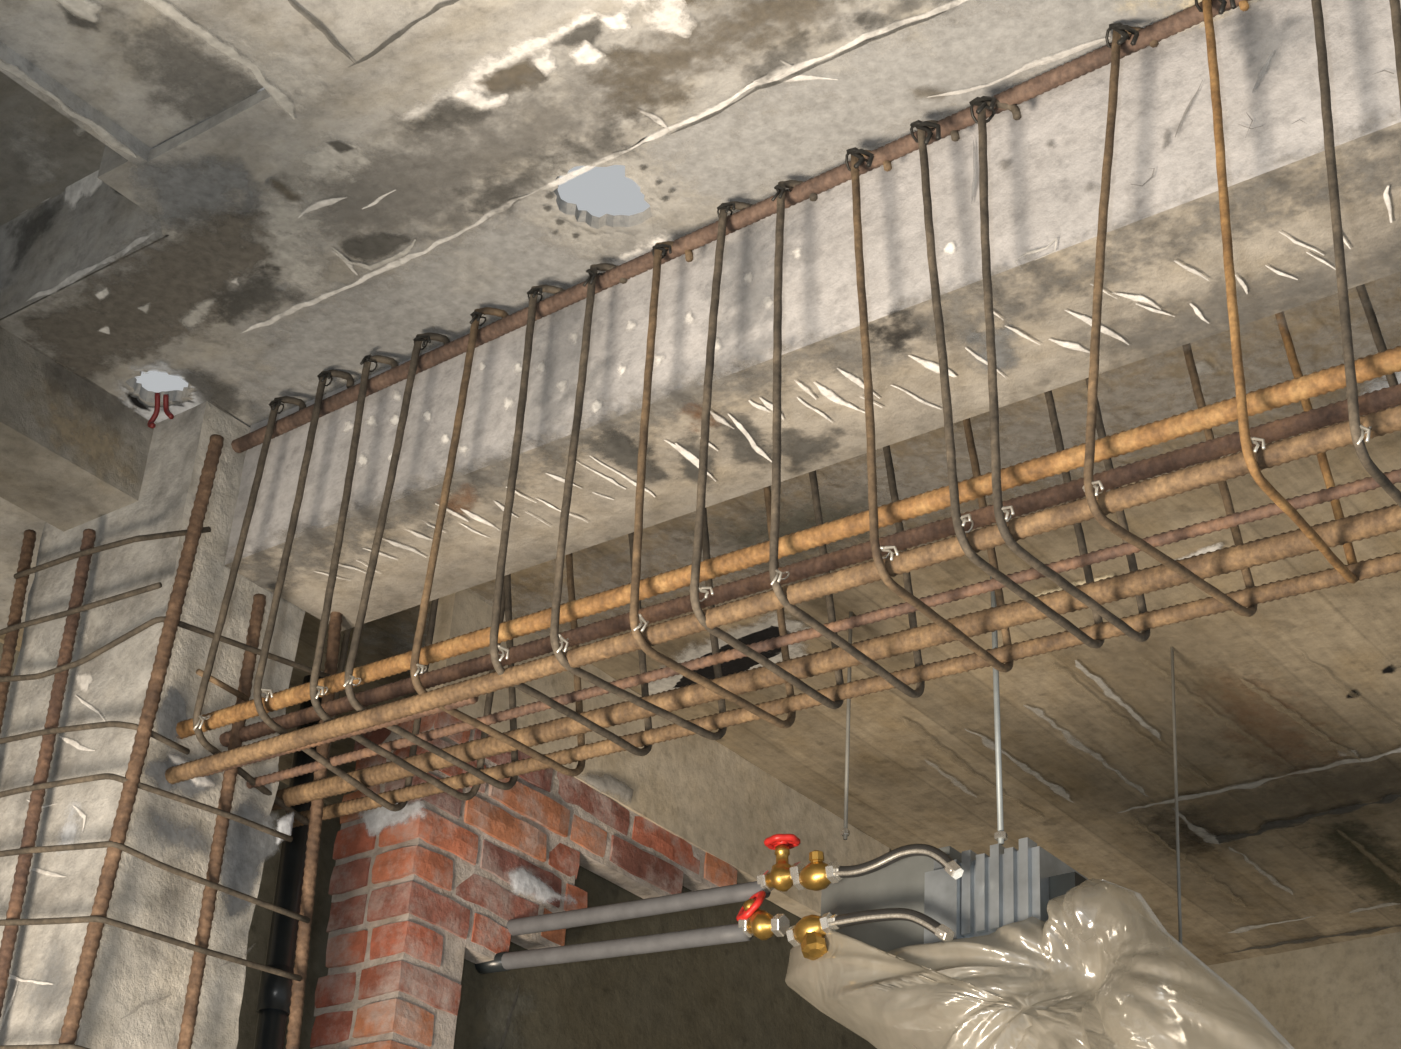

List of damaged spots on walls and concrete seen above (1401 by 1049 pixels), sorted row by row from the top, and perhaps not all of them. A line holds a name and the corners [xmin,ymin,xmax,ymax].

water stain [122,26,265,121]
water stain [298,0,824,243]
crack [242,0,967,333]
water stain [15,157,303,476]
peeling [344,391,401,431]
spalling [1035,575,1113,597]
spalling [1182,544,1222,559]
spalling [648,613,807,695]
peeling [144,686,216,798]
peeling [151,803,294,917]
crack [1118,748,1401,813]
crack [1206,794,1401,844]